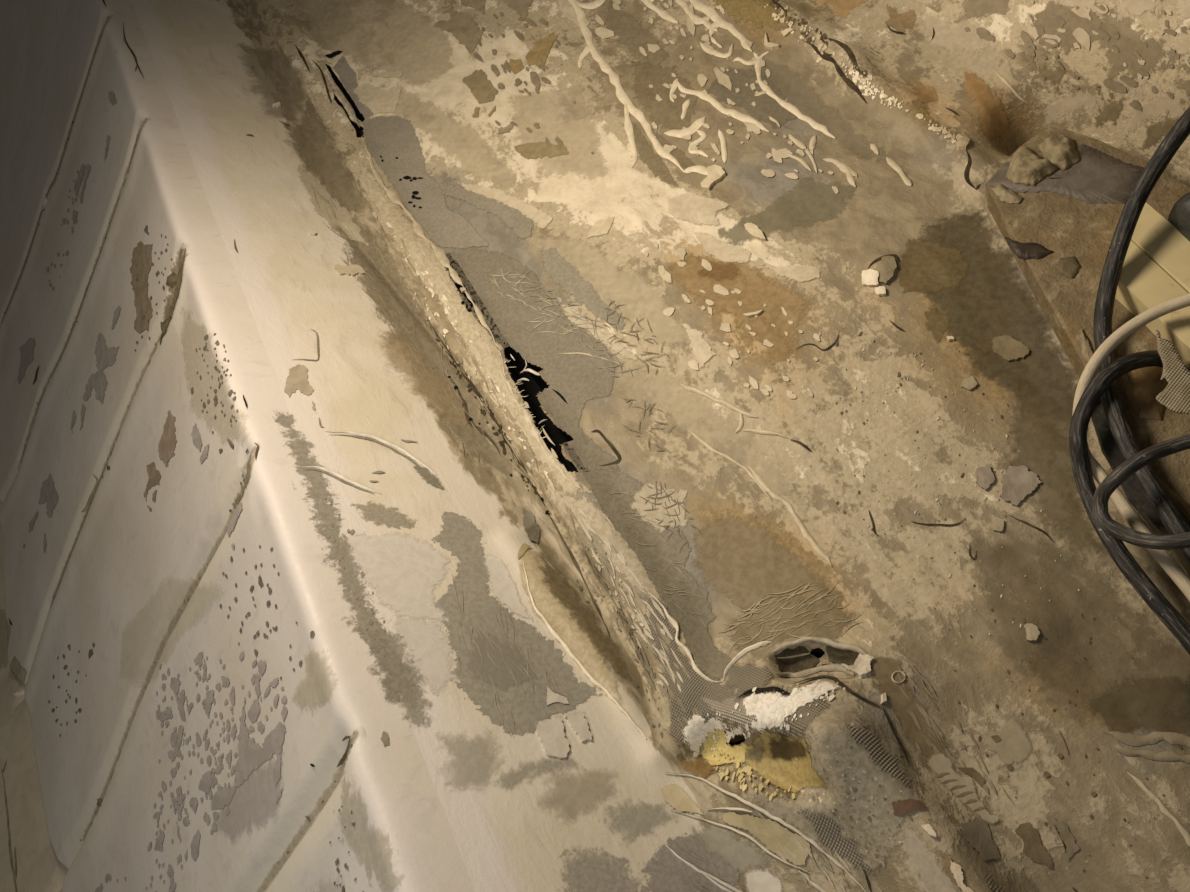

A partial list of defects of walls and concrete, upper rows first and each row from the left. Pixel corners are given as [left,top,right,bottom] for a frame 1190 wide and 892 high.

crack [295,45,332,104]
crack [804,31,868,103]
crack [887,25,935,40]
peeling [130,241,152,333]
peeling [284,364,316,412]
crack [292,329,319,361]
peeling [333,56,733,680]
damp [664,255,809,364]
damp [897,211,1103,550]
damp [694,515,852,649]
peeling [841,653,874,679]
peeling [155,674,286,861]